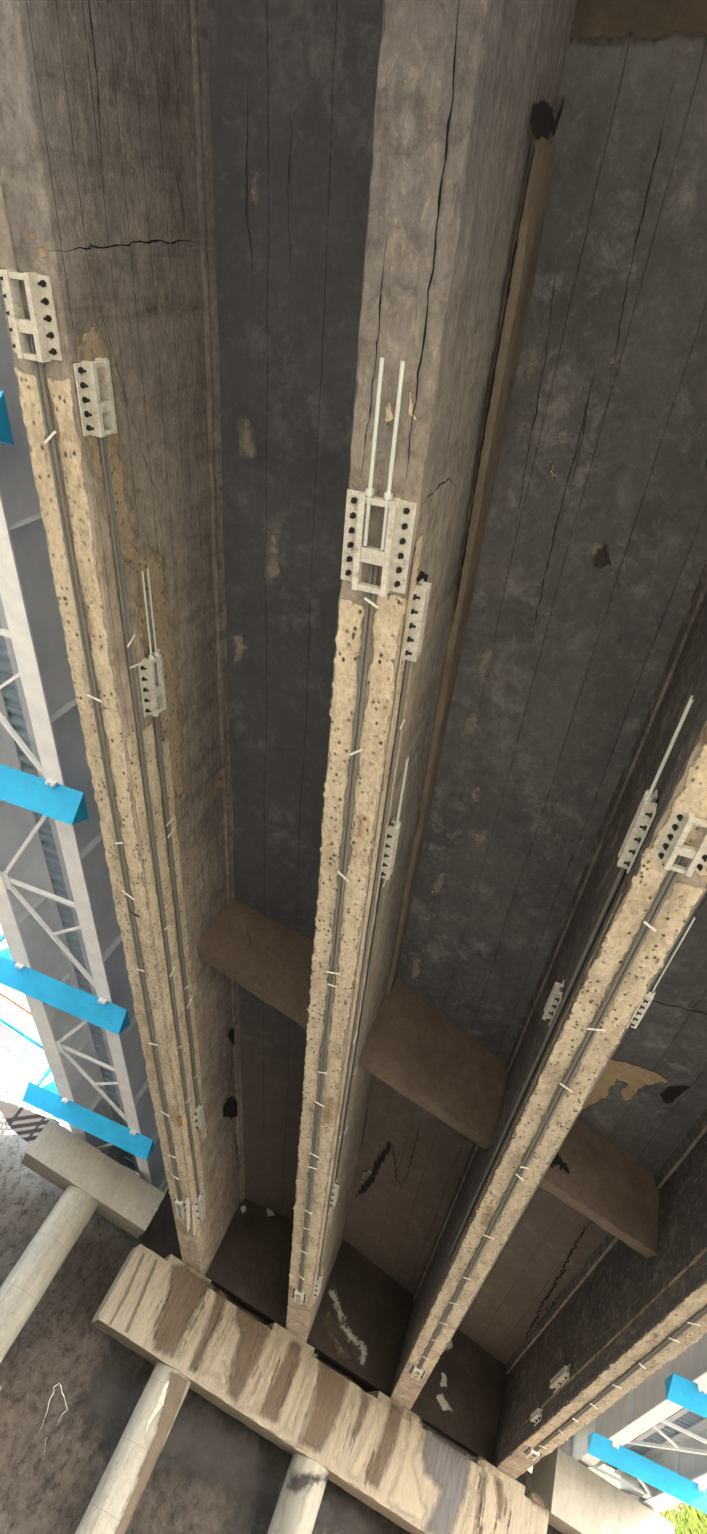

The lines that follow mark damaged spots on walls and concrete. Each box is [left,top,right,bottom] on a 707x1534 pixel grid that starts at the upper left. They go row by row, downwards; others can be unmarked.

crack [50,0,196,515]
crack [360,239,387,476]
crack [406,0,535,622]
spalling [530,100,555,141]
spalling [591,543,611,568]
spalling [404,727,707,1372]
leakage [110,1254,511,1534]
crack [526,1224,585,1338]